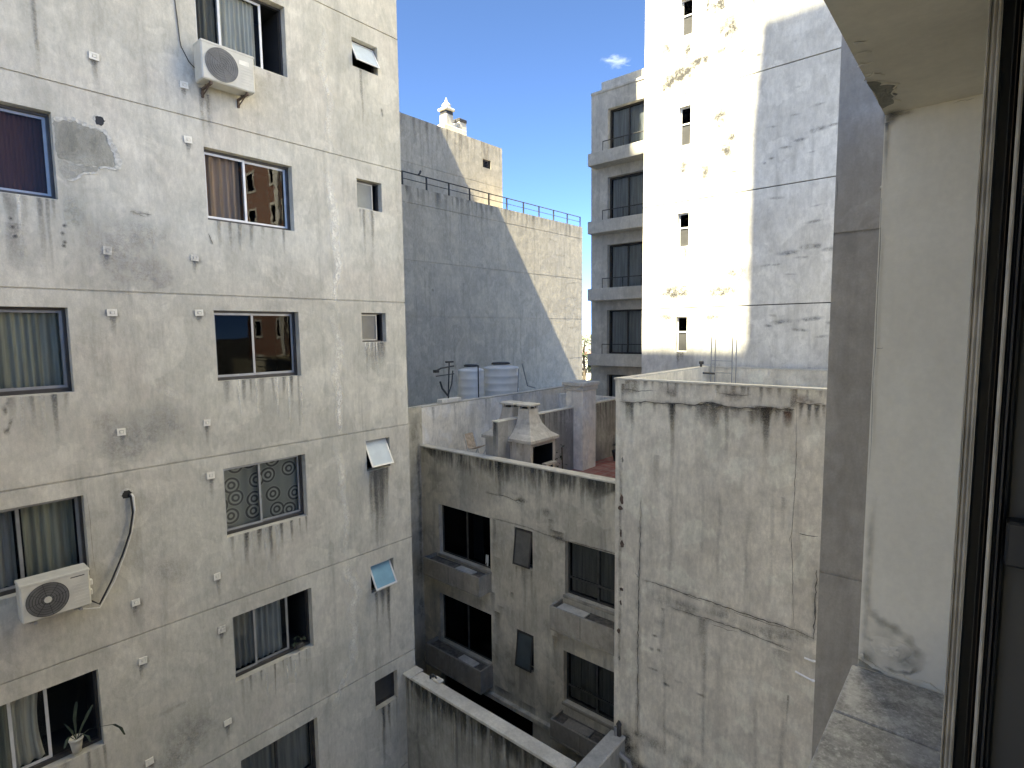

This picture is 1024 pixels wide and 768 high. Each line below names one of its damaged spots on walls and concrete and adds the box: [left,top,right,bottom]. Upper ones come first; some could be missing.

peeling [853,39,901,109]
spalling [52,114,123,182]
water stain [752,403,819,423]
water stain [369,467,388,505]
water stain [481,459,570,483]
water stain [588,479,615,491]
crack [489,453,818,729]